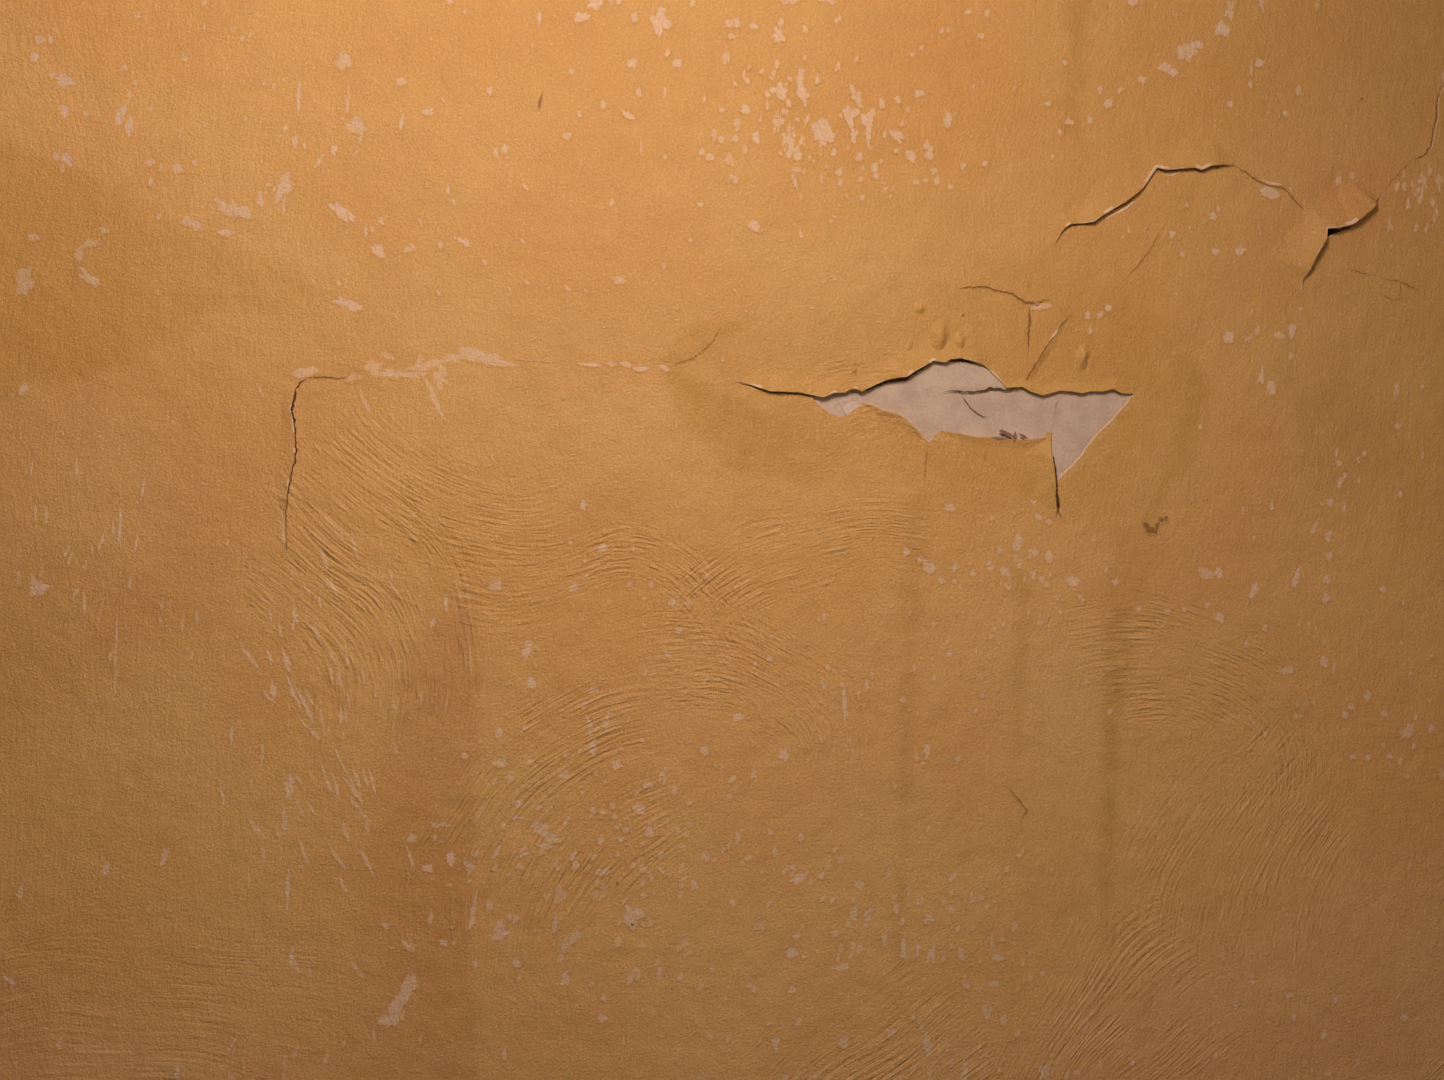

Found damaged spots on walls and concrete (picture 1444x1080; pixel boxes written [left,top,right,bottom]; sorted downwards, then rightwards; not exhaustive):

crack [1048,84,1444,291]
crack [957,279,1071,381]
crack [275,327,721,558]
peeling [736,338,1134,526]
peeling [901,530,1087,628]